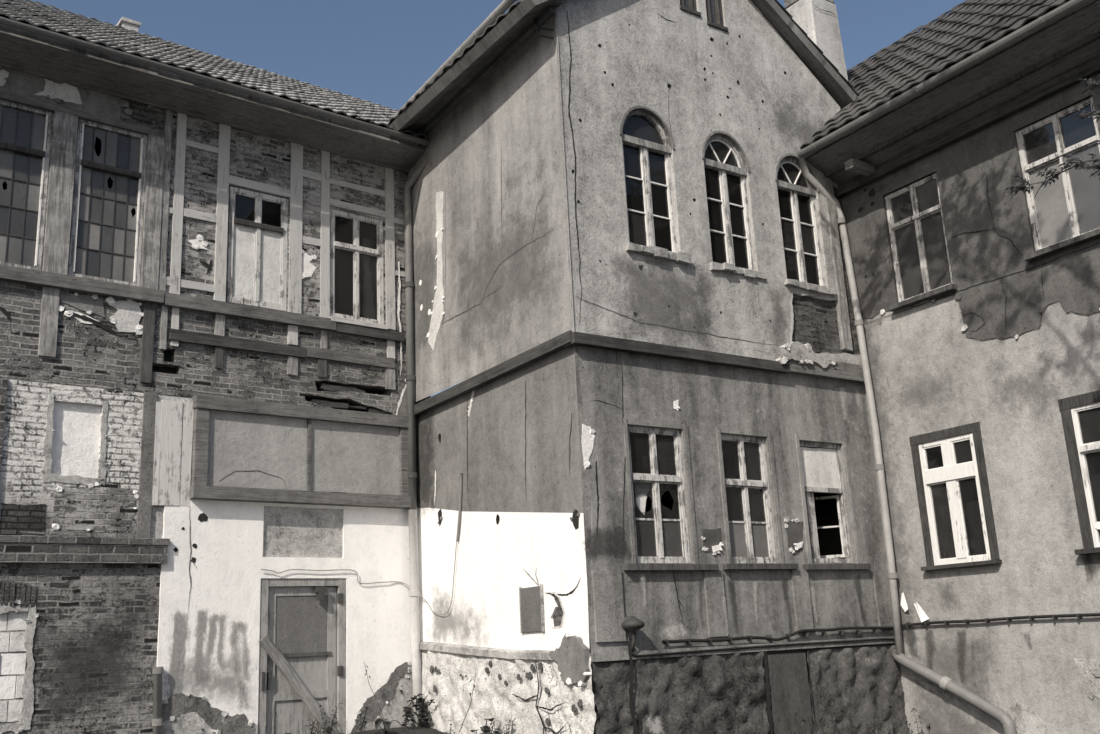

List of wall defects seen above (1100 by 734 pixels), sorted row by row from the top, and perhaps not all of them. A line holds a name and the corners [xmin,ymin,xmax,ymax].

peeling [0,66,9,86]
peeling [34,78,82,104]
crack [567,11,774,345]
flaking render [59,293,144,335]
peeling [419,191,445,350]
crack [442,191,549,324]
spalling [776,225,860,366]
crack [863,173,1100,331]
peeling [954,293,1100,340]
spalling [582,424,596,469]
spalling [162,693,258,734]
spalling [350,661,414,734]